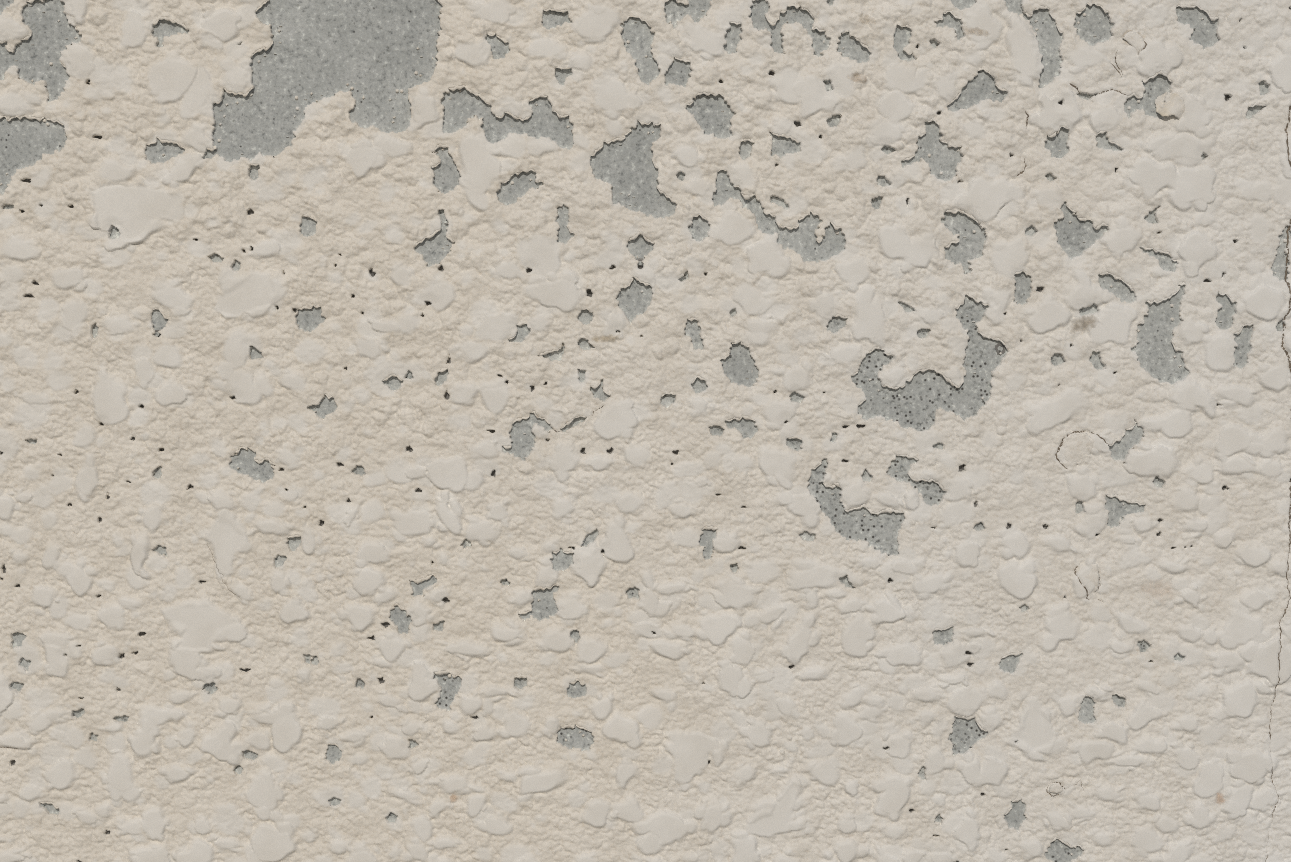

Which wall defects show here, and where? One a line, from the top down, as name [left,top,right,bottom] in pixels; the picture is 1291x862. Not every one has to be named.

peeling [0,0,82,209]
peeling [203,0,443,180]
peeling [432,85,574,194]
peeling [590,120,676,218]
peeling [621,14,754,160]
peeling [688,167,846,263]
peeling [723,0,871,63]
crack [1283,105,1291,166]
peeling [851,292,1008,431]
peeling [1098,246,1189,385]
crack [1281,219,1291,372]
crack [1265,480,1291,862]